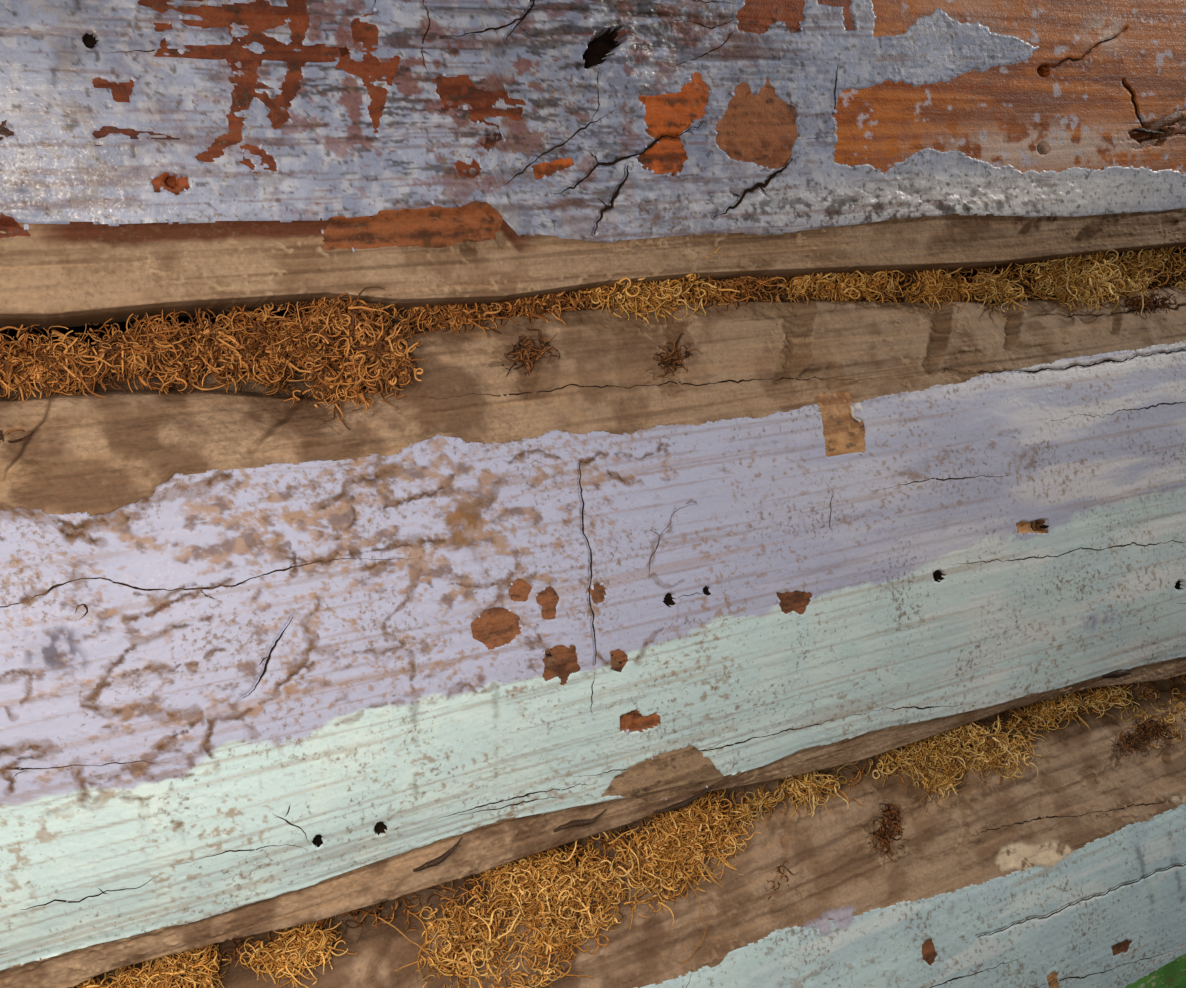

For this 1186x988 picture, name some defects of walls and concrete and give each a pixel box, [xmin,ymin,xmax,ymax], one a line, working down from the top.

peeling [137,0,401,173]
peeling [432,72,526,178]
crack [491,63,700,235]
crack [713,57,840,218]
peeling [833,0,1186,174]
crack [0,554,404,620]
crack [243,617,293,698]
peeling [471,579,559,649]
peeling [541,645,580,685]
crack [579,461,597,712]
crack [0,760,171,777]
peeling [601,746,723,802]